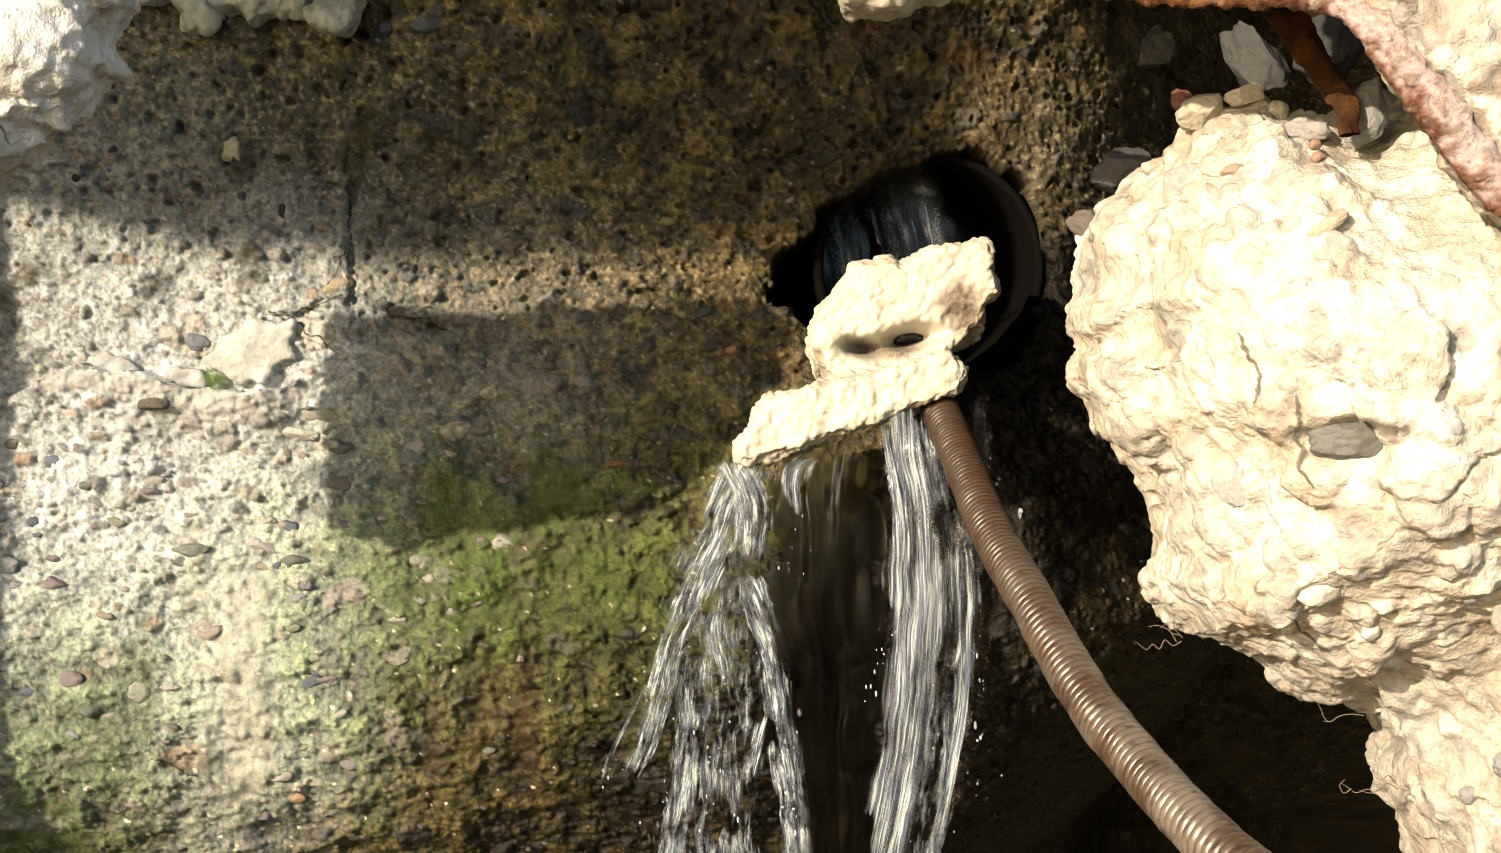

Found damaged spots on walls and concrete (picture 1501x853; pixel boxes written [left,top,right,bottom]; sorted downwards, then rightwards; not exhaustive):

crack [266,152,444,355]
efflorescence [218,584,272,794]